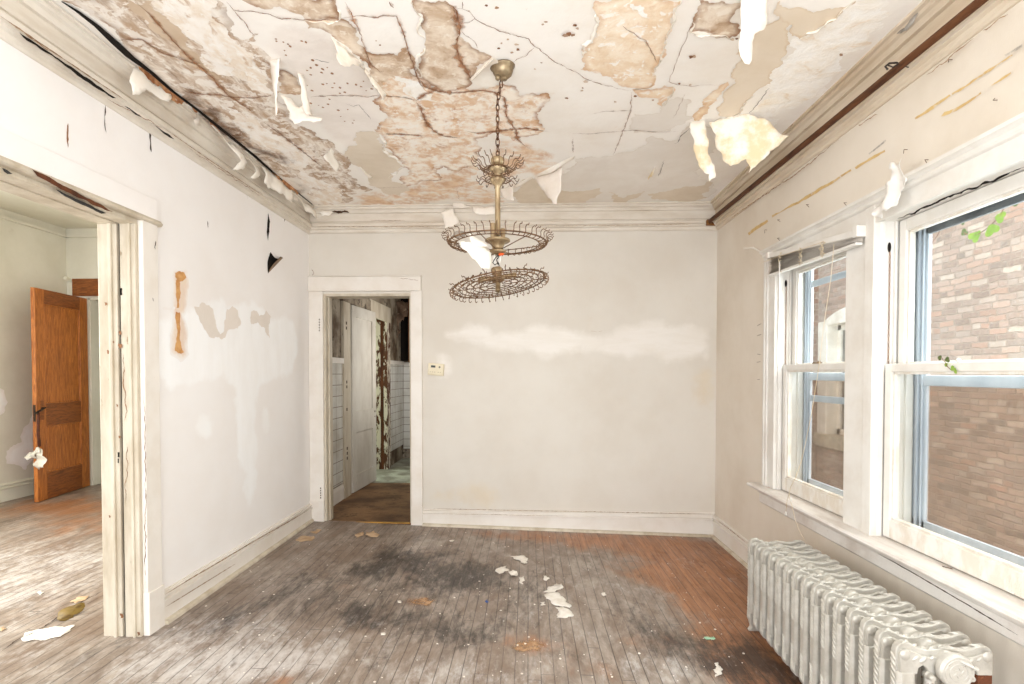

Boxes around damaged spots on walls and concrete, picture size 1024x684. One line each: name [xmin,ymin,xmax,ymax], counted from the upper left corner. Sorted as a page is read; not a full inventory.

crack [104,99,159,152]
crack [129,2,343,188]
leakage [62,0,570,205]
peeling [127,0,520,205]
crack [230,2,649,155]
crack [623,14,698,176]
peeling [513,0,891,203]
peeling [194,302,271,339]